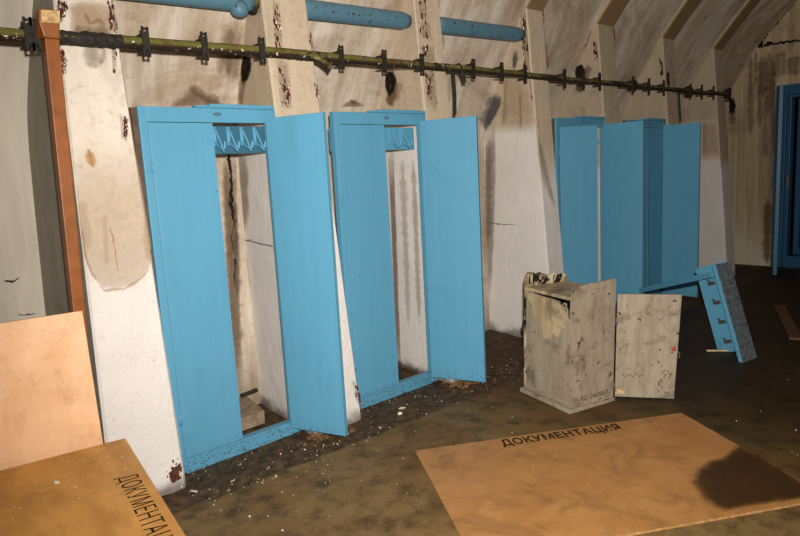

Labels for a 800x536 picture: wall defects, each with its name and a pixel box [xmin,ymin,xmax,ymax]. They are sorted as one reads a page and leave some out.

peeling [107,0,118,33]
water stain [483,97,500,129]
crack [226,154,274,280]